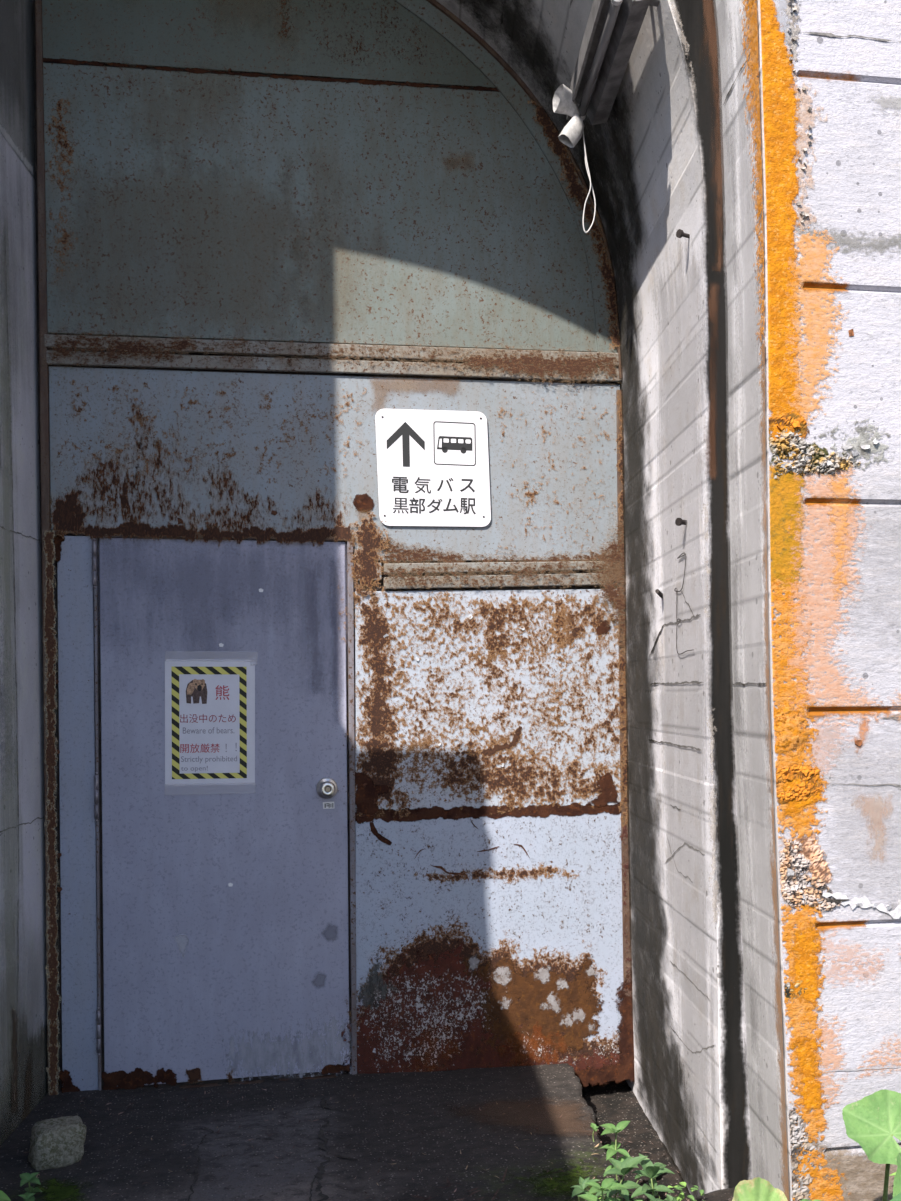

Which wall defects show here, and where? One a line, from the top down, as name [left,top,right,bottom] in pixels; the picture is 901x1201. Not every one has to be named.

corrosion [35,97,85,283]
spalling [769,411,892,479]
corrosion [43,99,635,1095]
damp [456,0,752,1198]
spalling [779,831,901,919]
damp [0,1010,48,1146]